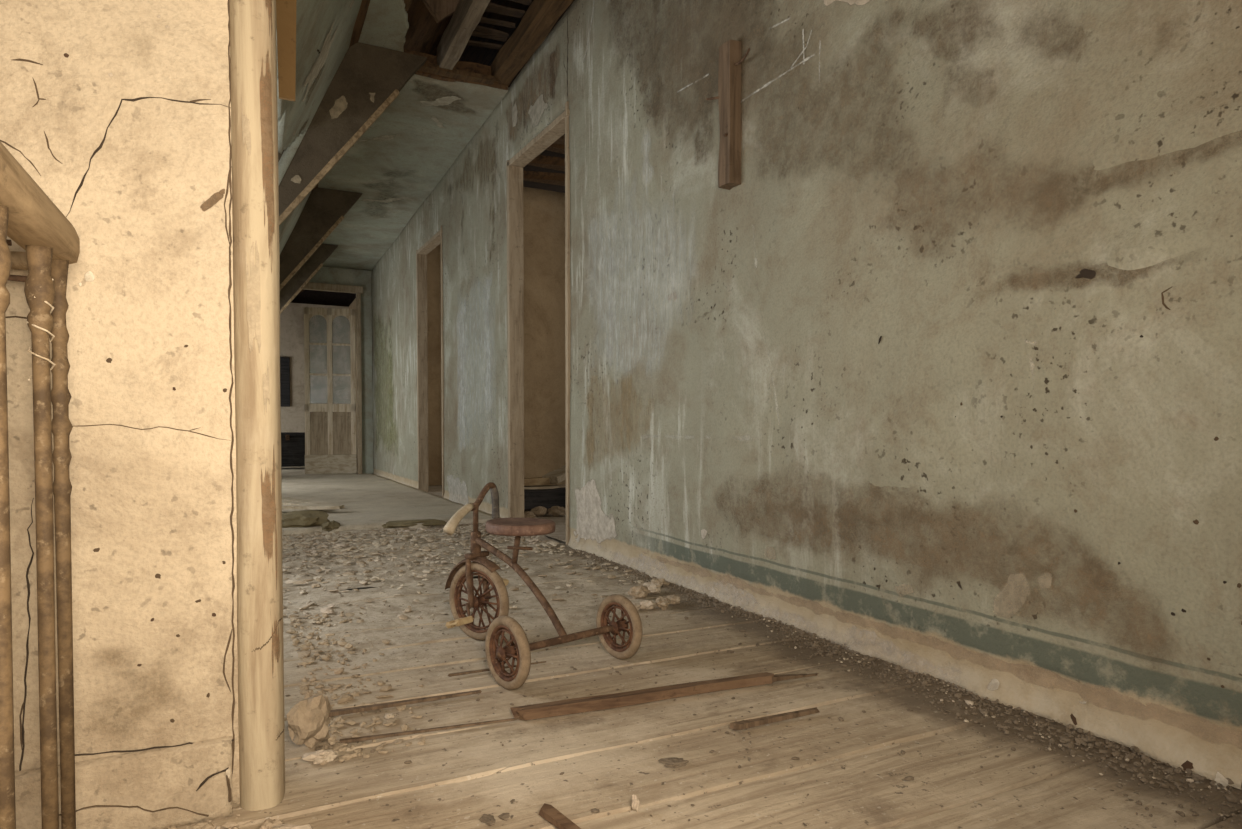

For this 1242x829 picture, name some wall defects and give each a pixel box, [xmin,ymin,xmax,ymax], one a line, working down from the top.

crack [824,0,870,8]
crack [0,0,282,817]
water stain [718,480,1165,655]